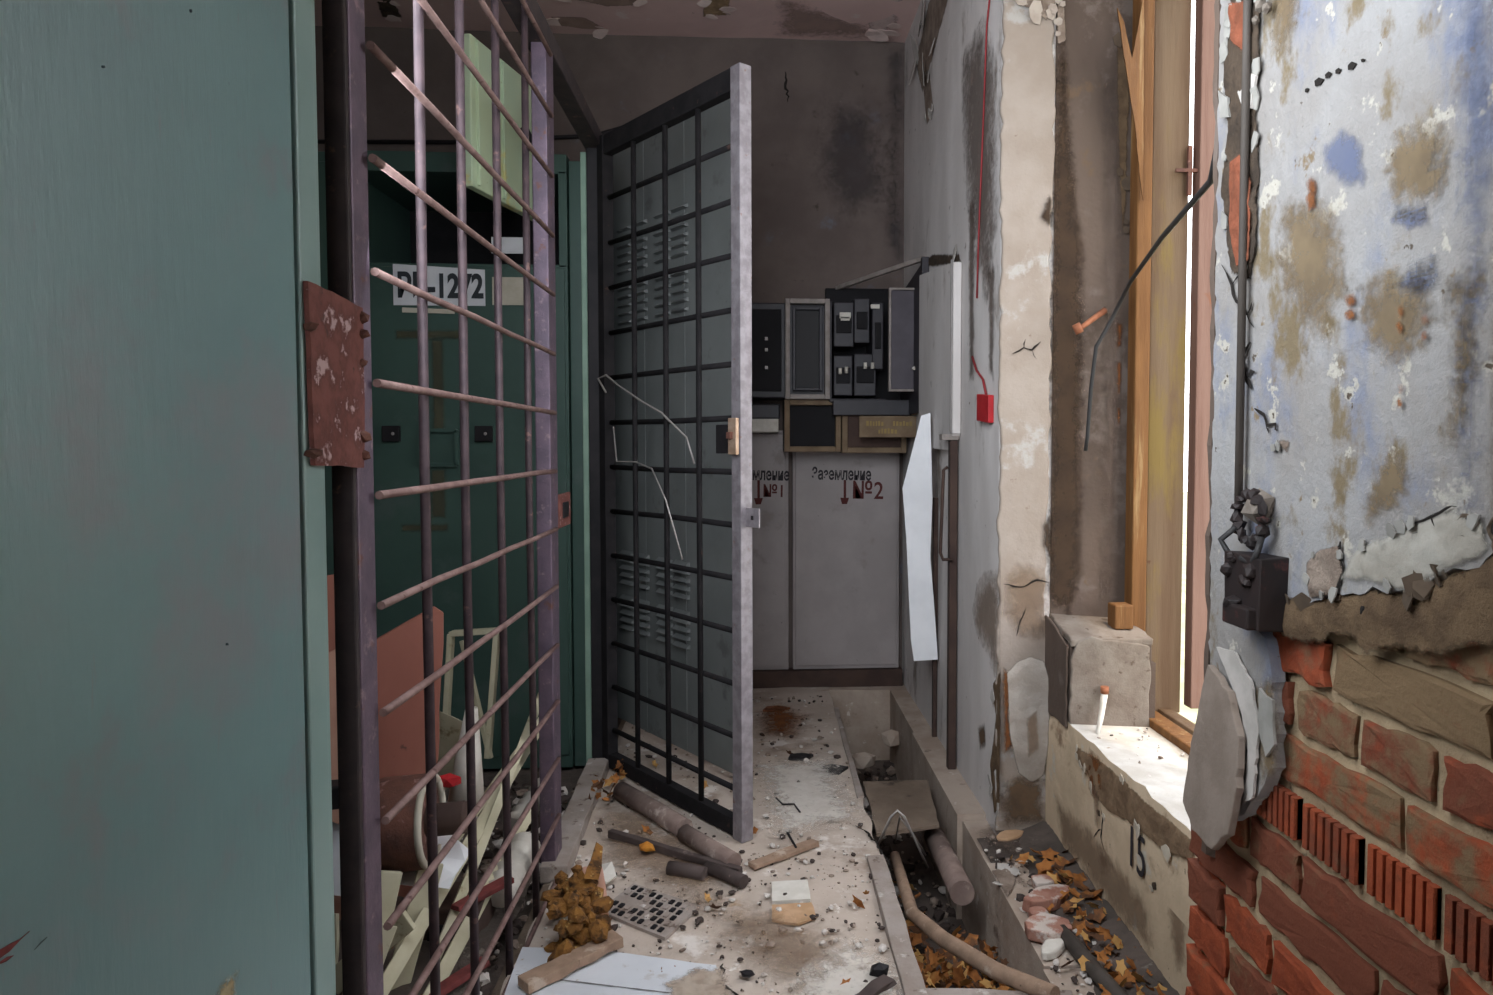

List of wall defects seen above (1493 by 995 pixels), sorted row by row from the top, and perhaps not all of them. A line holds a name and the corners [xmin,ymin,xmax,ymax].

peeling [546,0,648,39]
spalling [697,0,737,20]
peeling [865,0,947,123]
spalling [1015,0,1066,44]
water stain [1386,126,1448,197]
water stain [1279,200,1344,333]
water stain [1361,270,1429,356]
water stain [1440,281,1476,437]
water stain [1367,455,1404,516]
spalling [1279,512,1493,656]
flaking render [1075,647,1277,863]